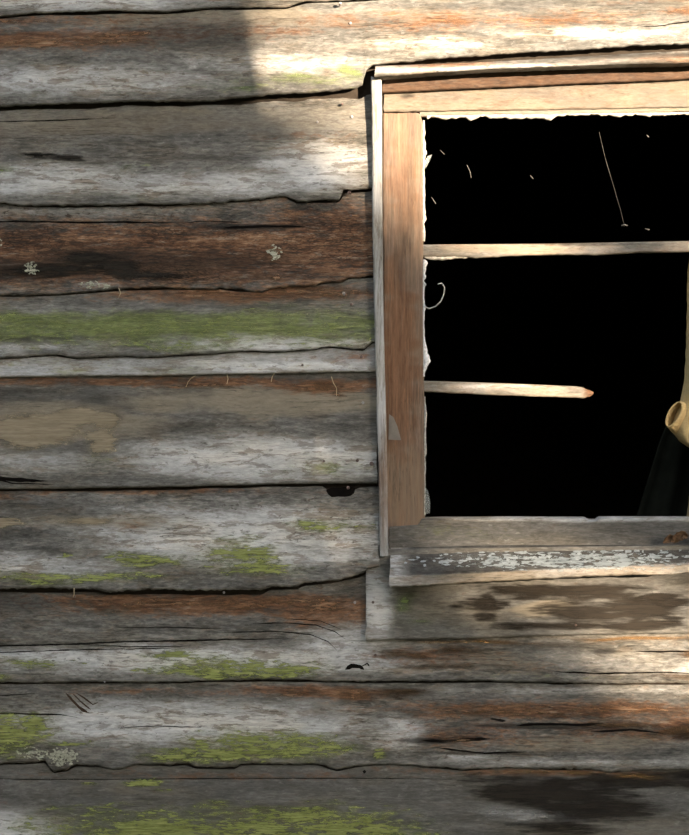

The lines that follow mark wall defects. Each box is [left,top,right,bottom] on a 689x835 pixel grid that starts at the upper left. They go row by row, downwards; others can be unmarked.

peeling [404,550,689,573]
damp [451,584,689,631]
crack [422,718,659,754]
damp [462,771,689,835]